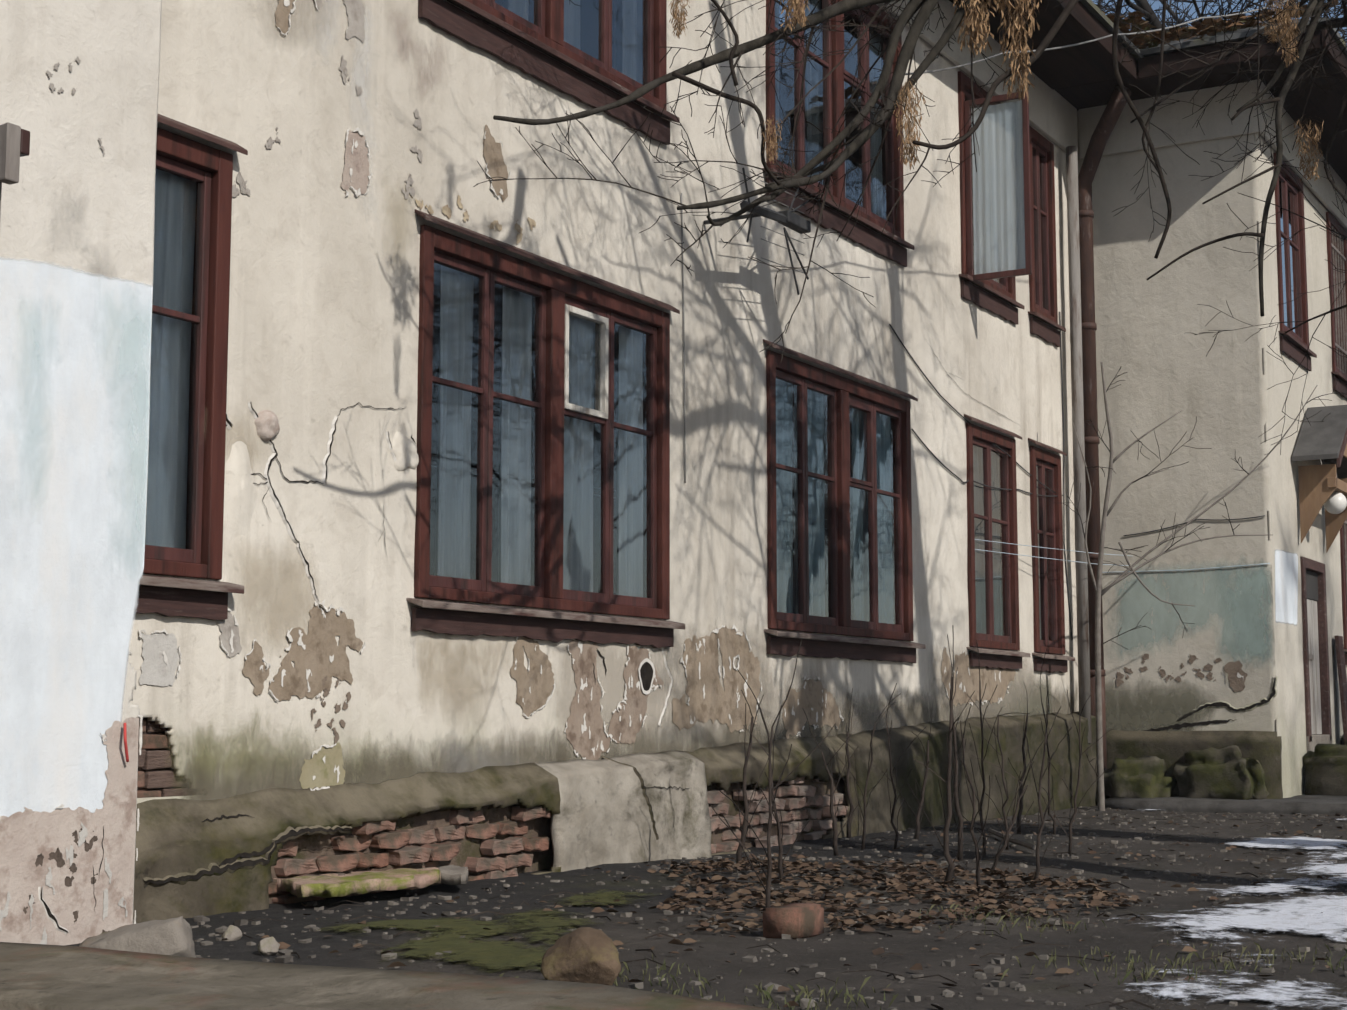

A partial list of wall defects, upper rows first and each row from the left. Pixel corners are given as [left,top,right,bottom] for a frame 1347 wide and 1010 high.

crack [226,402,416,618]
flaking render [217,597,366,791]
flaking render [510,636,555,718]
flaking render [564,625,762,760]
water stain [343,681,1077,784]
water stain [1105,686,1214,731]
crack [1143,676,1278,731]
crack [38,886,68,935]
flaking render [0,715,195,946]
crack [93,827,104,914]
crack [143,814,353,888]
flaking render [268,804,552,904]